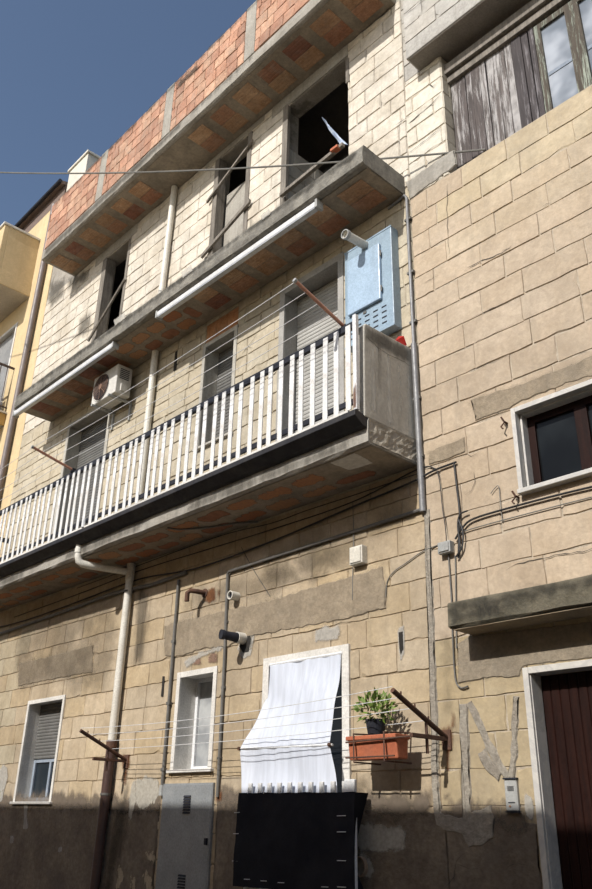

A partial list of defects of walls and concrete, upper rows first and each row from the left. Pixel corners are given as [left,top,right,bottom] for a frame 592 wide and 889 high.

water stain [24,277,184,392]
crack [508,548,592,569]
flaking render [128,775,159,820]
peeling [357,823,405,879]